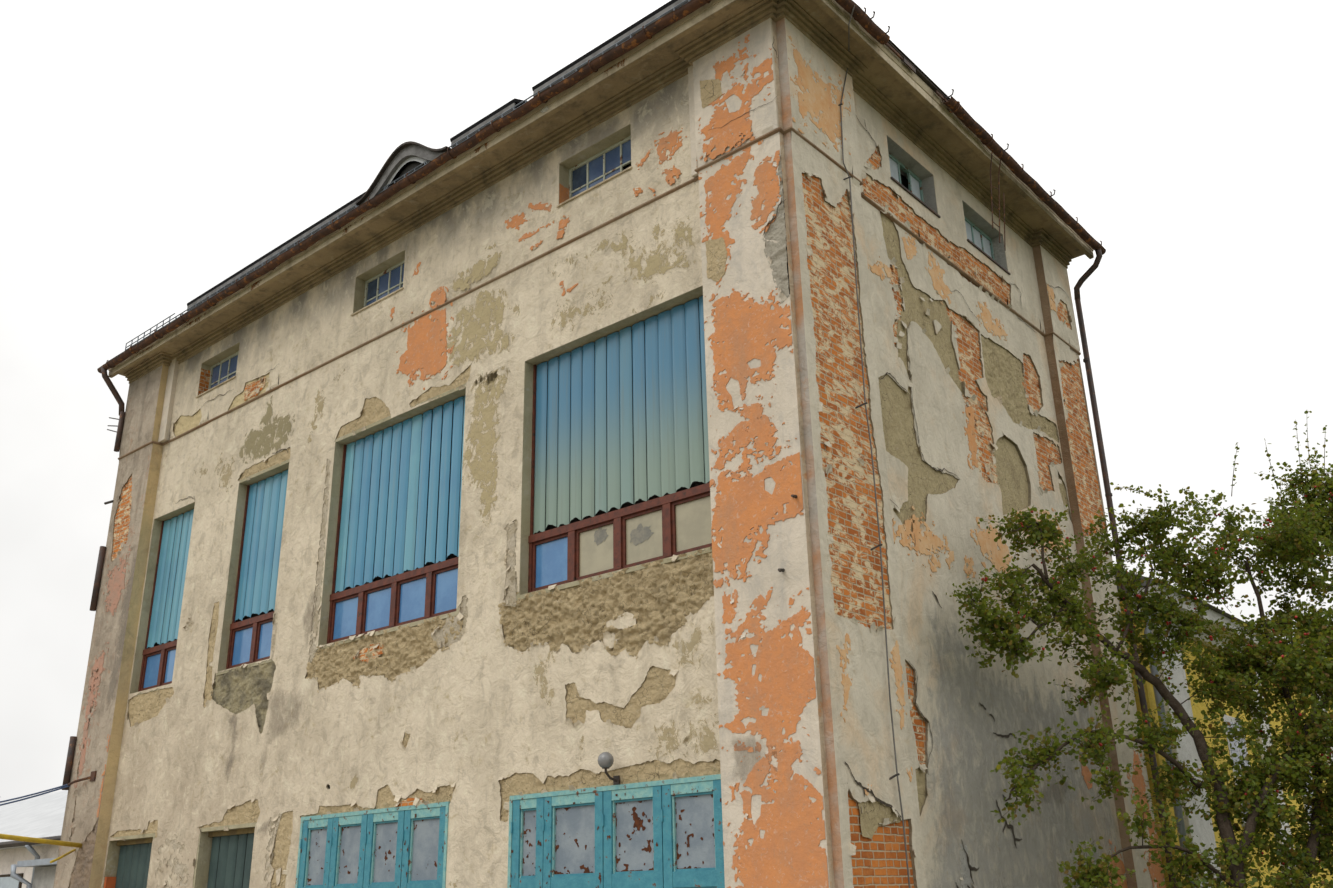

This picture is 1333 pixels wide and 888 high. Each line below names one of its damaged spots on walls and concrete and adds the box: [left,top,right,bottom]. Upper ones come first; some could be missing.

peeling [390,286,471,407]
spalling [498,34,829,888]
flaking render [787,35,1105,888]
flaking render [102,476,133,622]
spalling [306,459,468,693]
spalling [203,602,278,733]
spalling [69,642,195,888]
rust [301,814,423,887]
rust [511,789,721,888]